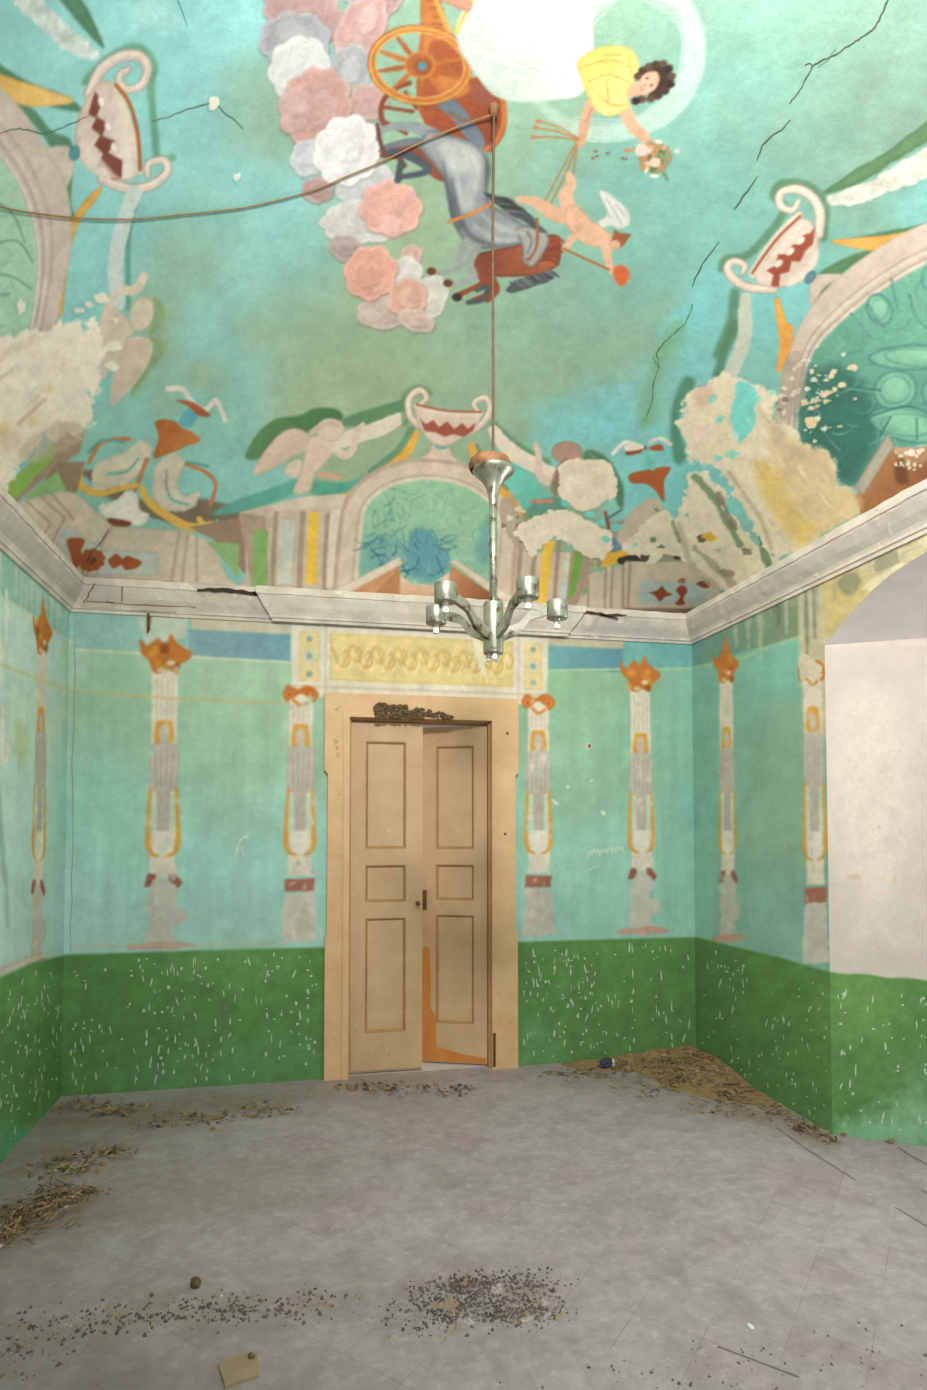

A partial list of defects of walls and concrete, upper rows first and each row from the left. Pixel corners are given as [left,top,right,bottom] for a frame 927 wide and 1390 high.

crack [734,0,888,210]
flaking render [0,290,124,494]
crack [644,242,719,421]
flaking render [498,343,867,592]